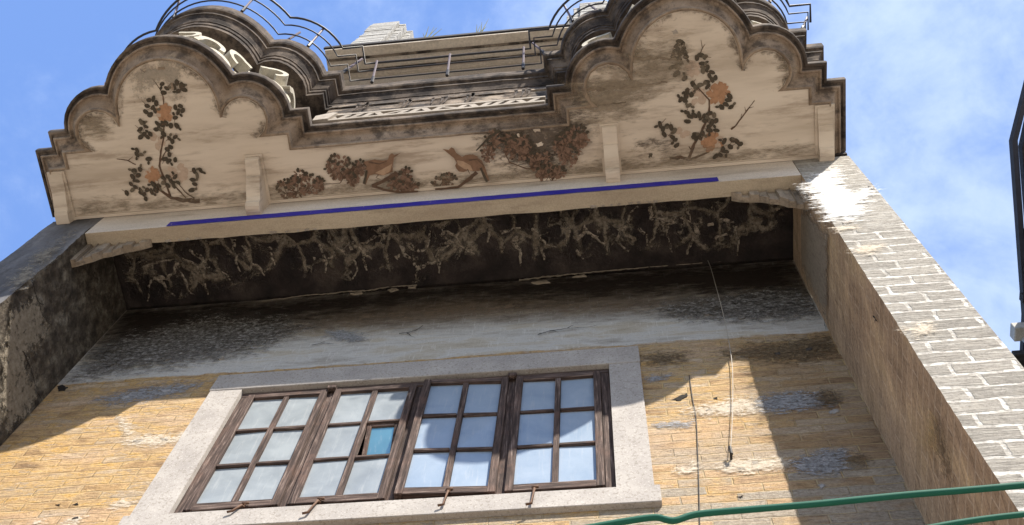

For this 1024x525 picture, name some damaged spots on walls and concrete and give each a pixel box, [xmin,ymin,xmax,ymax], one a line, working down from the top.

water stain [7,230,76,290]
mould [650,285,820,324]
water stain [64,312,311,406]
water stain [640,350,696,383]
water stain [713,330,840,365]
water stain [752,387,844,415]
water stain [787,448,876,489]